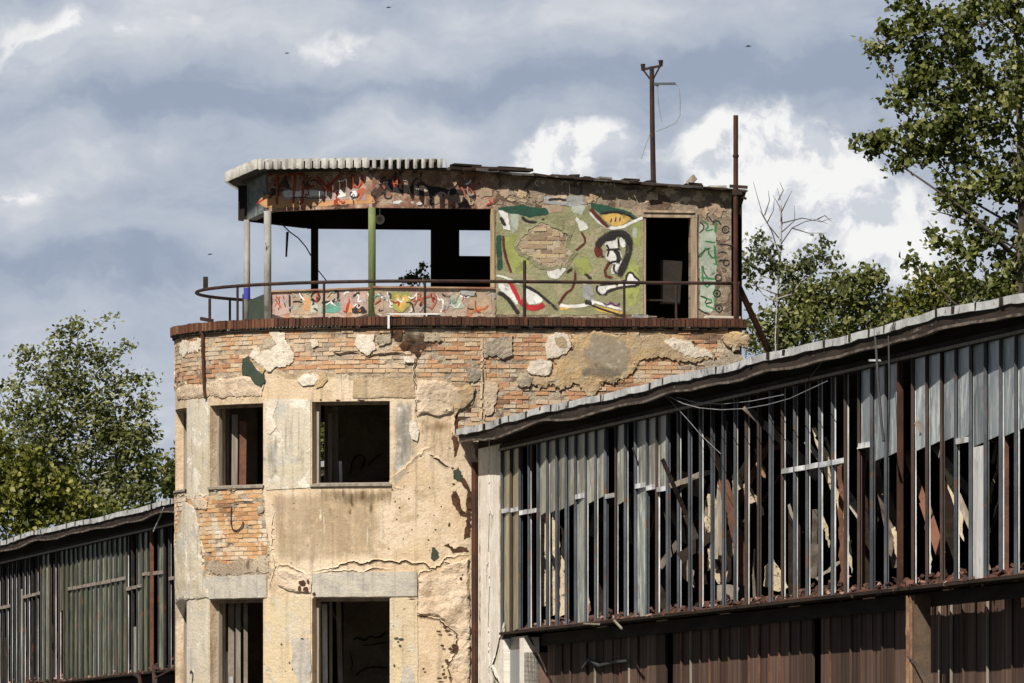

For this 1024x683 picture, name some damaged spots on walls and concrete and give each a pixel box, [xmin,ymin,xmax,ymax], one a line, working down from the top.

flaking render [513,218,578,271]
flaking render [174,488,315,601]
crack [268,341,505,683]
flaking render [174,328,749,561]